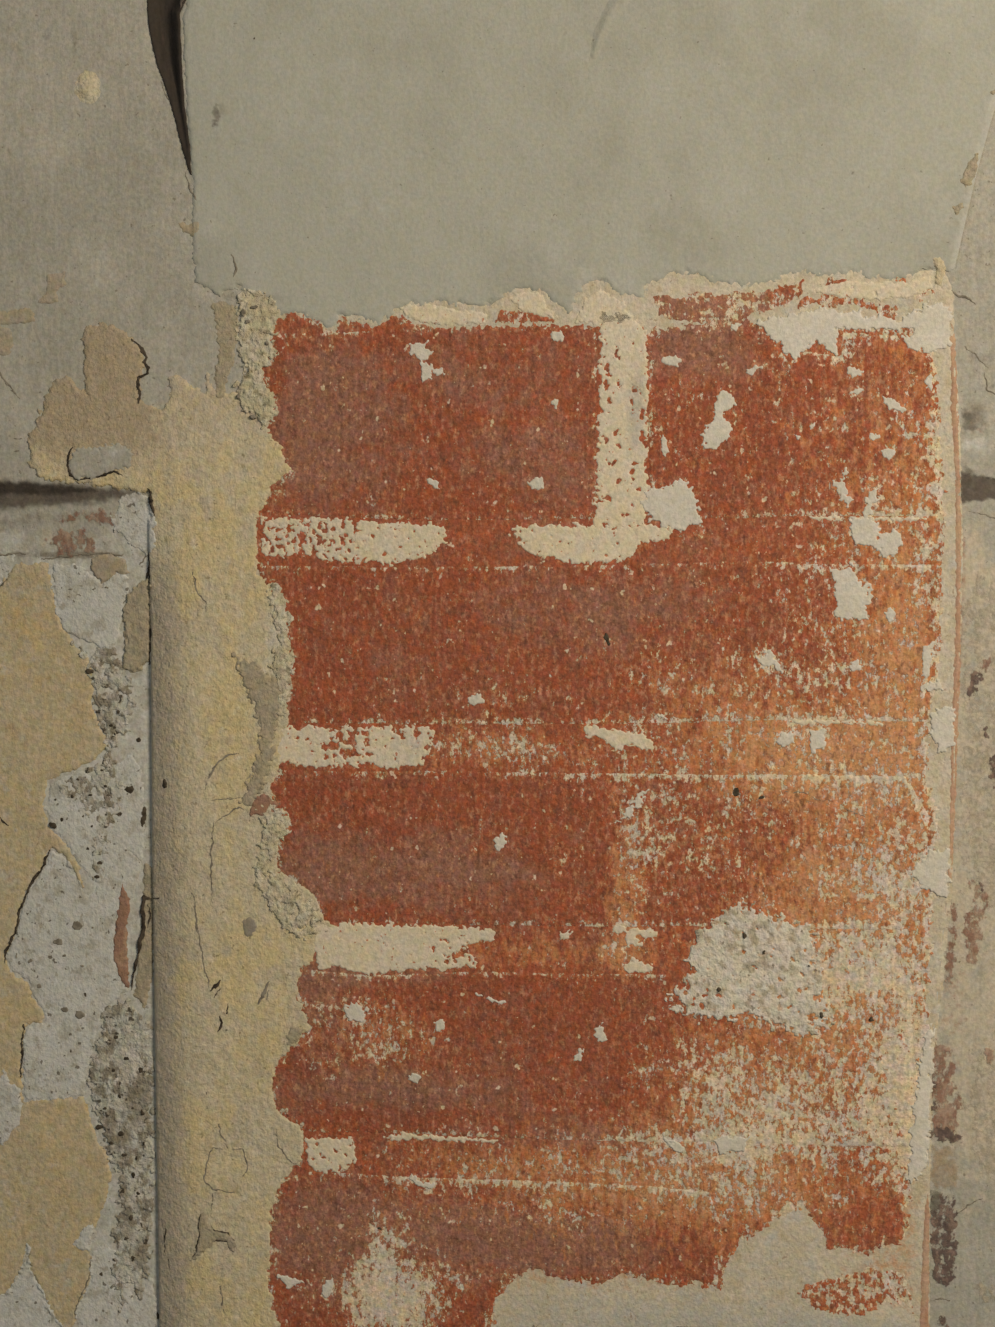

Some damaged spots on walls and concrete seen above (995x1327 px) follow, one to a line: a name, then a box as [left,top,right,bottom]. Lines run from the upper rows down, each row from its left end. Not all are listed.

spalling [211,288,279,430]
crack [964,346,995,395]
flaking render [66,443,134,481]
crack [66,447,155,515]
flaking render [110,492,157,556]
spalling [231,582,324,941]
peeling [0,563,159,1327]
peeling [191,1212,236,1260]
peeling [277,1274,304,1289]